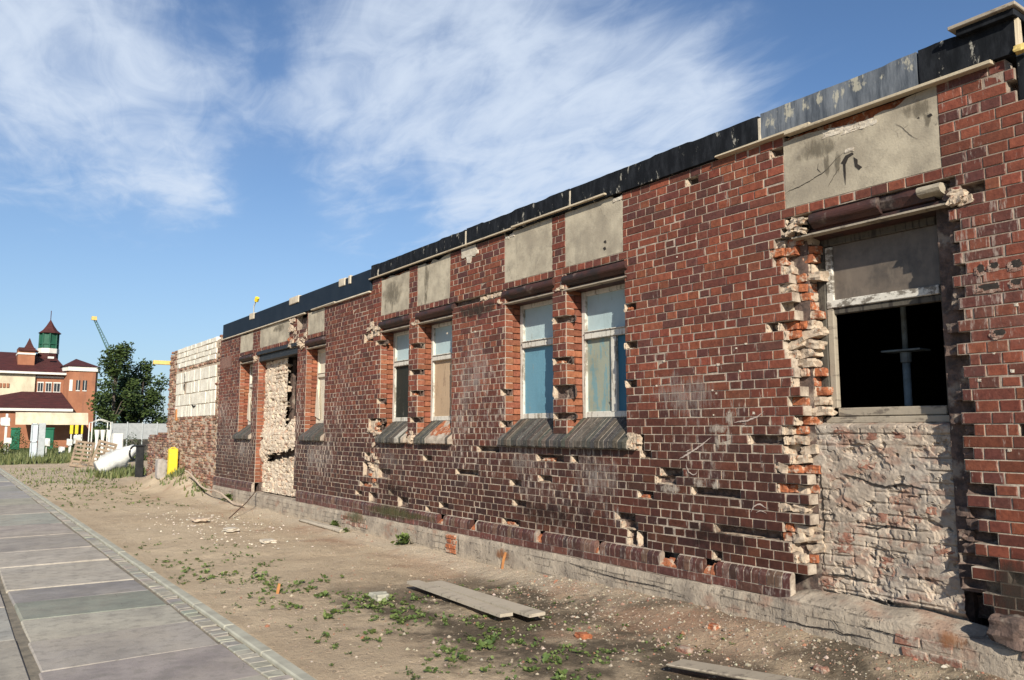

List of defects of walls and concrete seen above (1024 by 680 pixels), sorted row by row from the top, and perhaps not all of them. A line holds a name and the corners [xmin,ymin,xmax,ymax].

spalling [822,117,877,139]
spalling [945,183,985,207]
spalling [766,217,826,340]
spalling [747,356,833,445]
peeling [833,429,877,441]
spalling [356,418,409,507]
spalling [778,465,822,493]
spalling [614,512,648,547]
peeling [832,532,854,554]